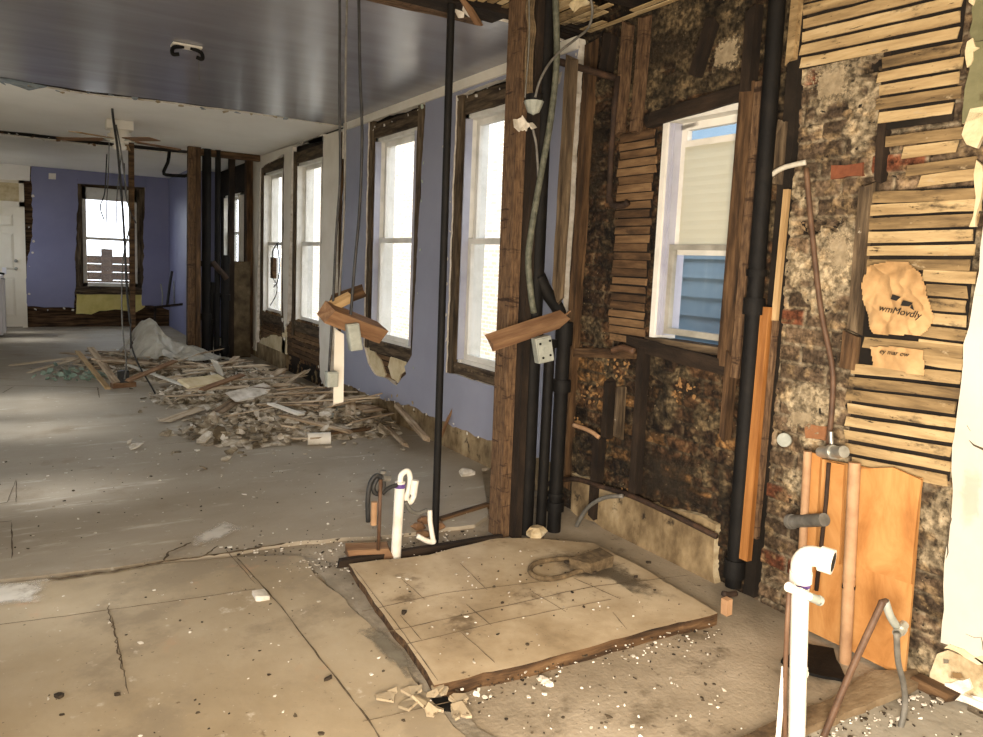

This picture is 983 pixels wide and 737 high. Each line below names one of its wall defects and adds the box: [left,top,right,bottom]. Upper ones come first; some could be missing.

flaking render [562,0,768,583]
flaking render [755,0,983,617]
flaking render [907,471,983,712]